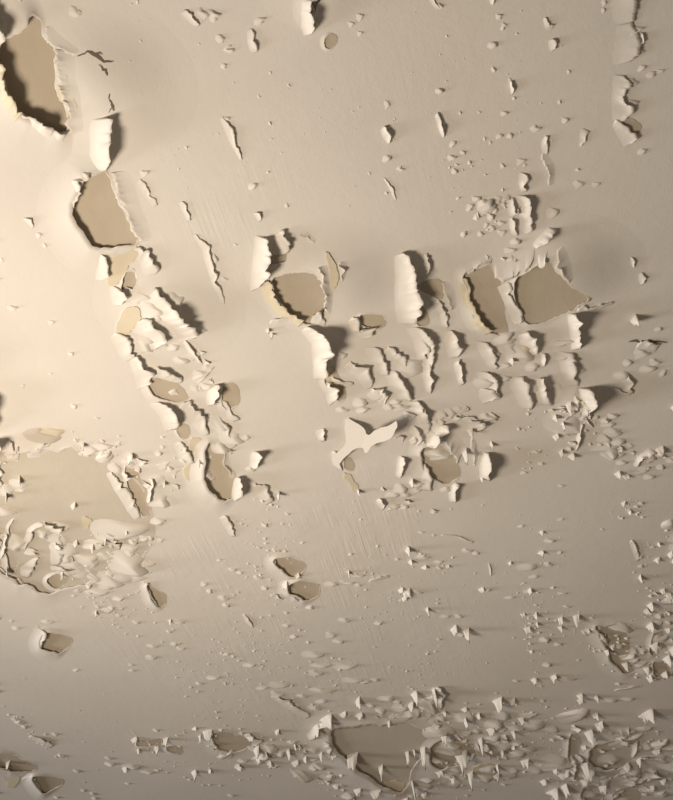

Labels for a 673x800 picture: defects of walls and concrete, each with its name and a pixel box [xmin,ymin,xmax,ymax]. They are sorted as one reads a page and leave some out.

peeling [529,124,555,185]
peeling [610,0,665,155]
peeling [0,0,355,635]
peeling [250,158,673,511]
peeling [653,519,673,565]
peeling [28,620,73,661]
peeling [131,574,673,800]
peeling [0,746,64,800]